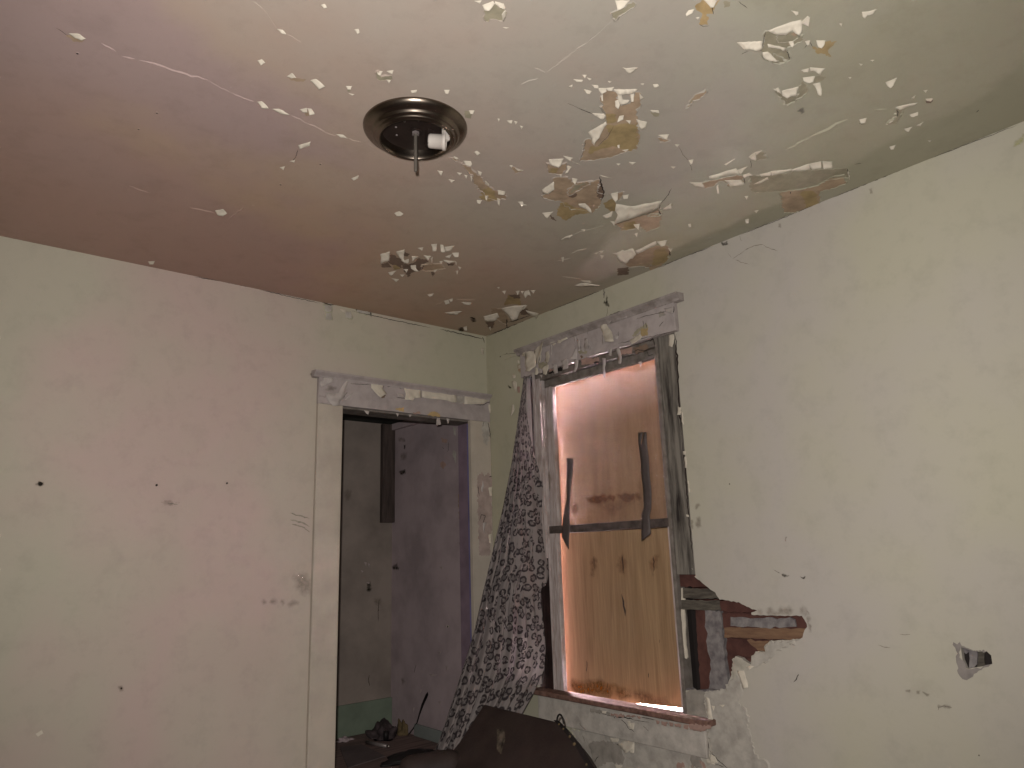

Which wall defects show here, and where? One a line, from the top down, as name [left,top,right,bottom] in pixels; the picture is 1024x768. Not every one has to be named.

peeling [737,11,837,106]
crack [103,44,359,142]
peeling [437,151,525,207]
peeling [541,75,673,275]
peeling [690,150,851,213]
peeling [380,244,461,282]
peeling [484,290,539,330]
spalling [569,575,807,768]
spalling [953,642,992,680]